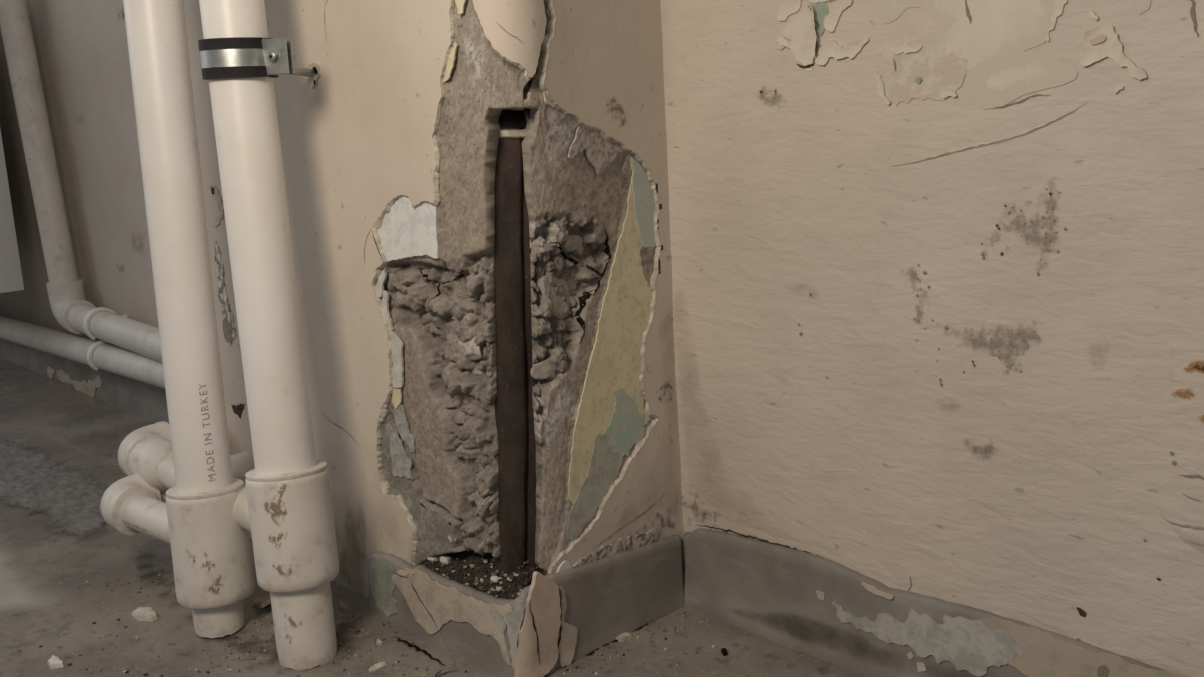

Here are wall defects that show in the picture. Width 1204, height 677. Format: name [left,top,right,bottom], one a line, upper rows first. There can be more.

peeling [775,0,870,71]
peeling [873,0,1148,110]
peeling [47,366,103,397]
peeling [209,185,236,346]
crack [420,271,464,304]
flaking render [369,0,661,666]
corrosion [493,110,541,575]
crack [550,221,611,344]
corrosion [1184,361,1204,373]
crack [530,597,562,665]